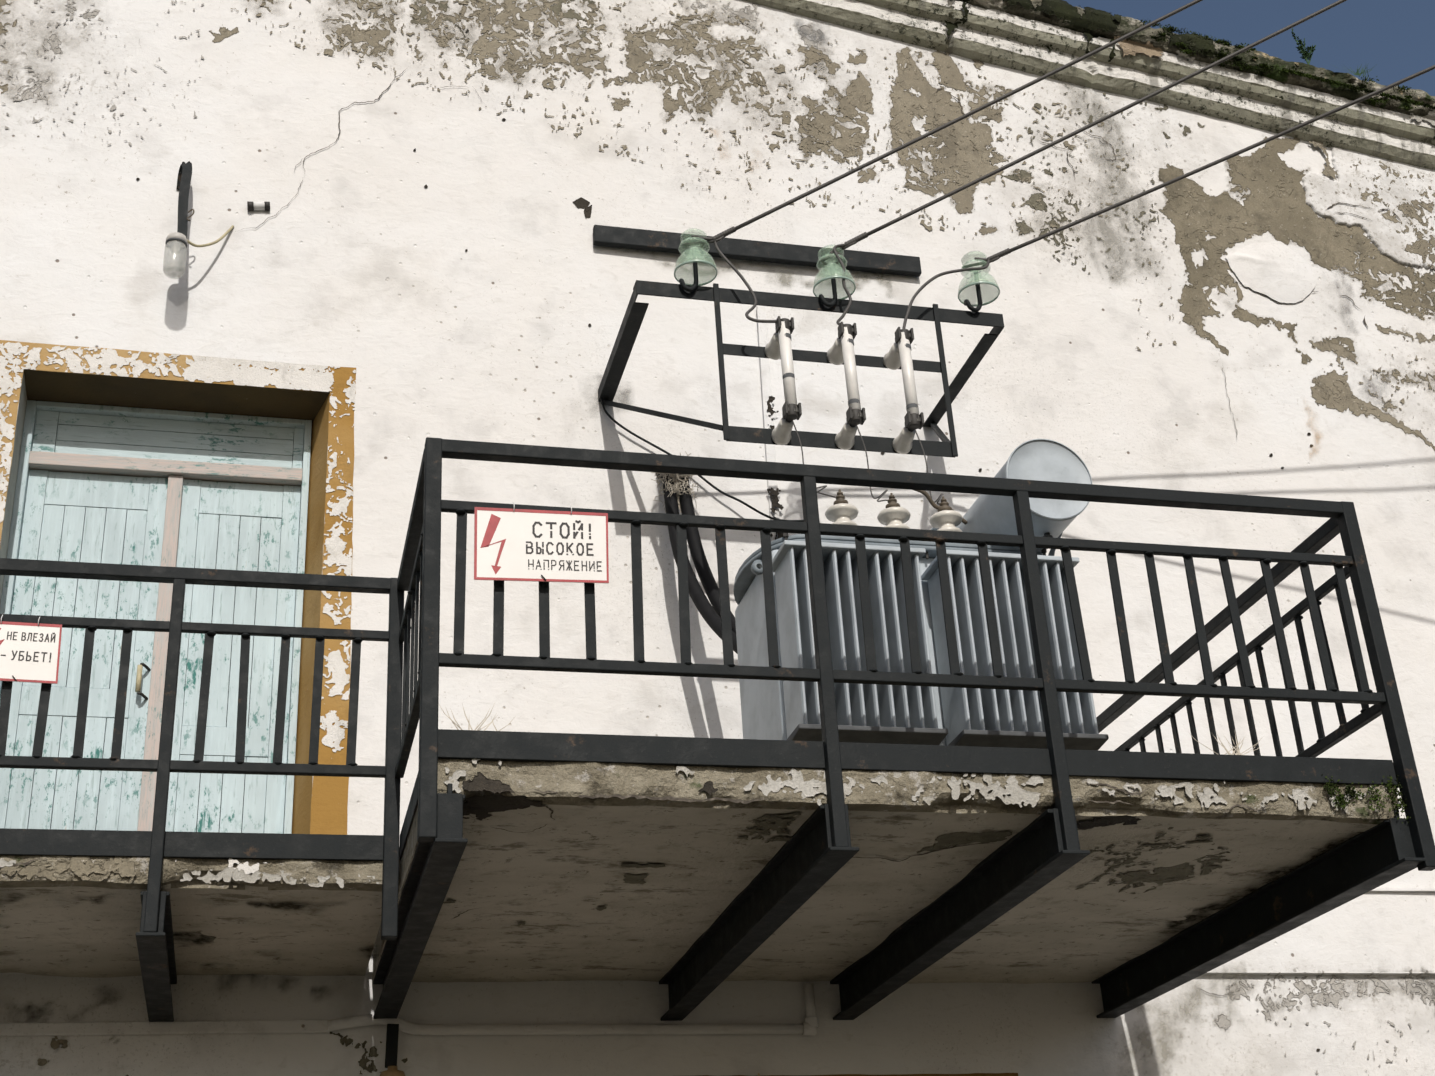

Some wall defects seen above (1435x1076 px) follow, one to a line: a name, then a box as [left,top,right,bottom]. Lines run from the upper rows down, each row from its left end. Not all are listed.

peeling [0,0,204,146]
crack [235,67,408,232]
peeling [0,342,356,625]
peeling [767,487,784,540]
peeling [320,640,350,752]
spalling [444,759,544,821]
peeling [737,768,902,843]
peeling [912,772,1044,807]
spalling [1077,815,1144,830]
peeling [1087,779,1374,813]
peeling [175,858,379,889]
peeling [1226,969,1435,1076]